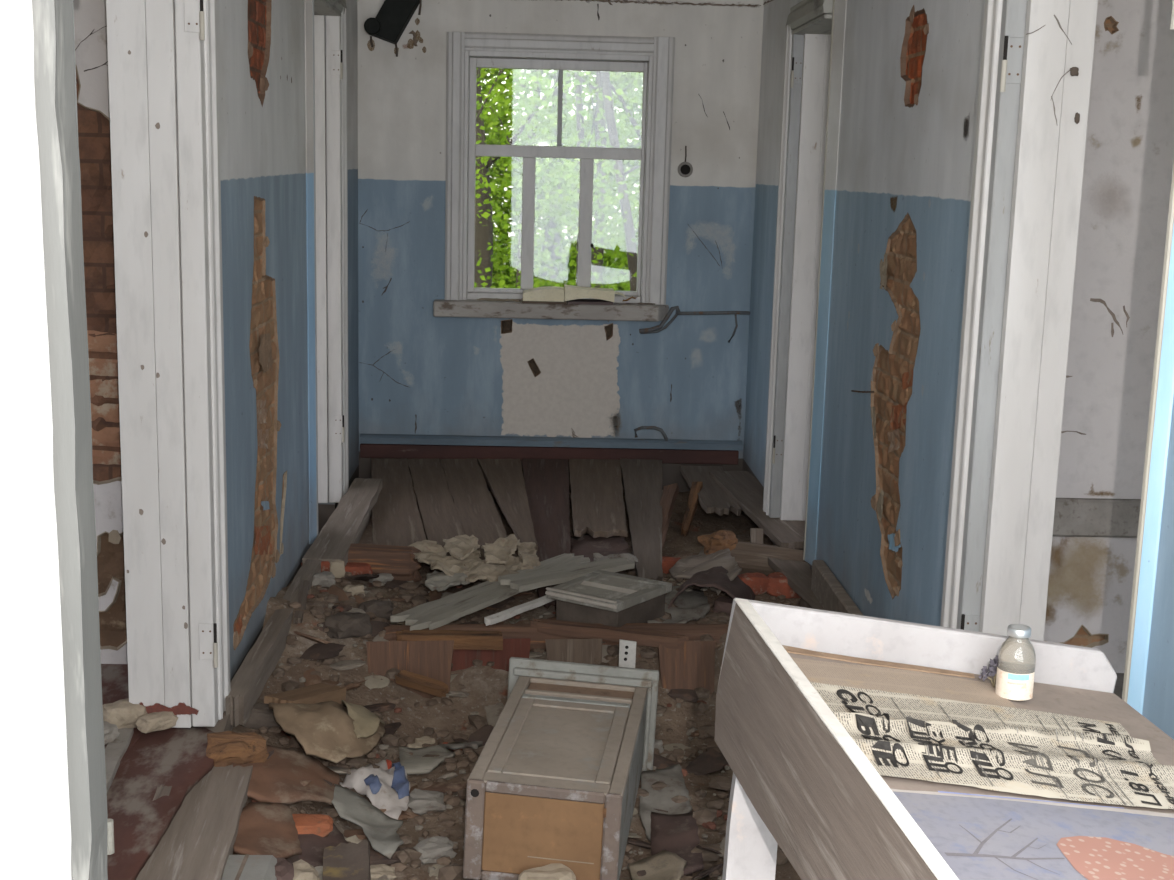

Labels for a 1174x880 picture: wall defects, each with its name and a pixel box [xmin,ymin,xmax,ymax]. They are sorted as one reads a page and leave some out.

spalling [248,0,292,107]
crack [533,0,773,20]
spalling [900,5,929,108]
flaking render [76,65,122,485]
peeling [233,196,287,650]
flaking render [499,319,634,438]
peeling [851,195,921,599]
peeling [97,530,127,651]
leakage [1045,536,1114,625]